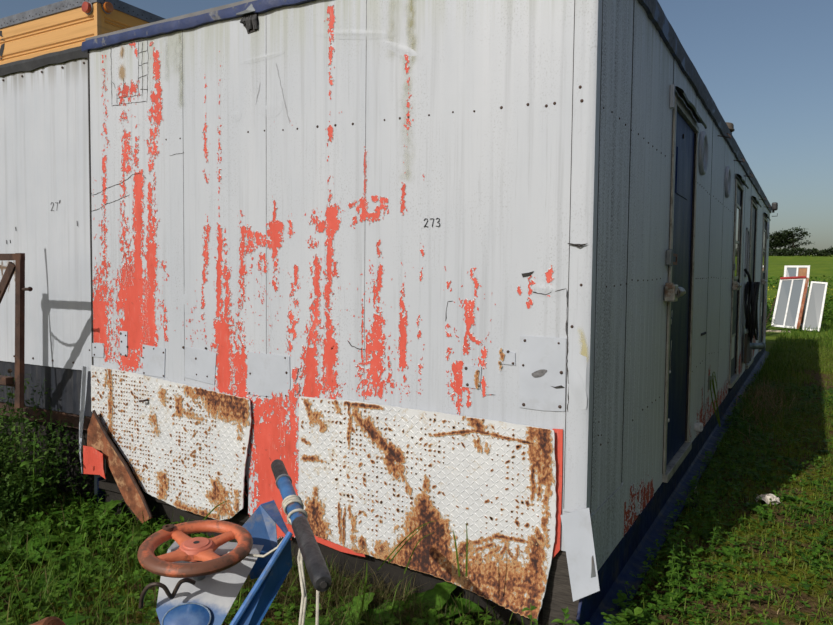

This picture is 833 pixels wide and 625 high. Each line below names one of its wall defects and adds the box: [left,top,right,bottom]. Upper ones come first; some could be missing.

peeling [324,5,336,100]
peeling [404,51,414,135]
peeling [202,115,222,194]
peeling [92,42,170,372]
peeling [516,264,554,309]
peeling [186,147,425,539]
peeling [445,267,491,415]
rust [91,369,249,520]
peeling [689,367,728,441]
rust [299,398,555,619]
peeling [623,472,656,537]